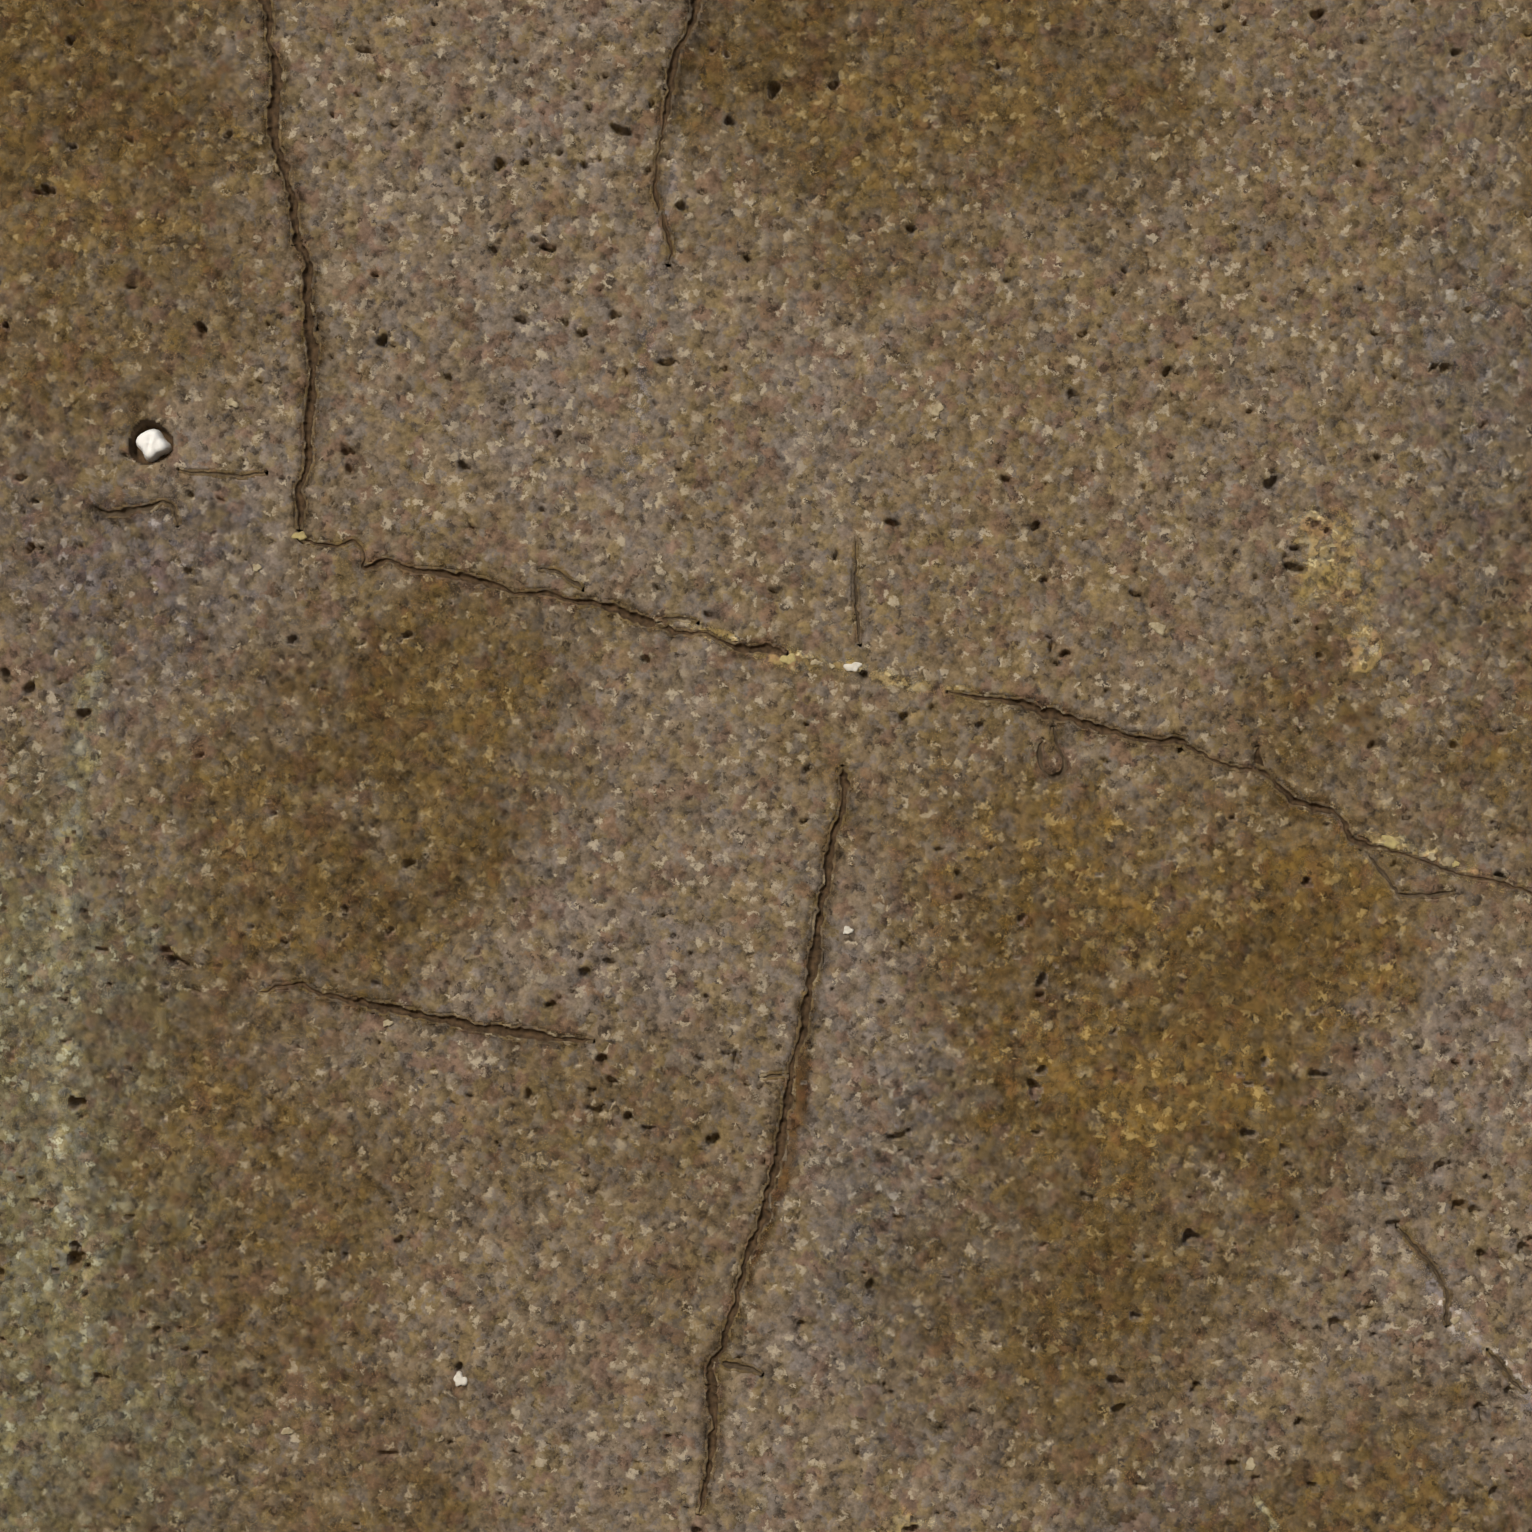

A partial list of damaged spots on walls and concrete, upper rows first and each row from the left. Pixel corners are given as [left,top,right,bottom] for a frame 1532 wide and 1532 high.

crack [96,0,1532,900]
crack [249,979,594,1046]
crack [695,766,853,1515]